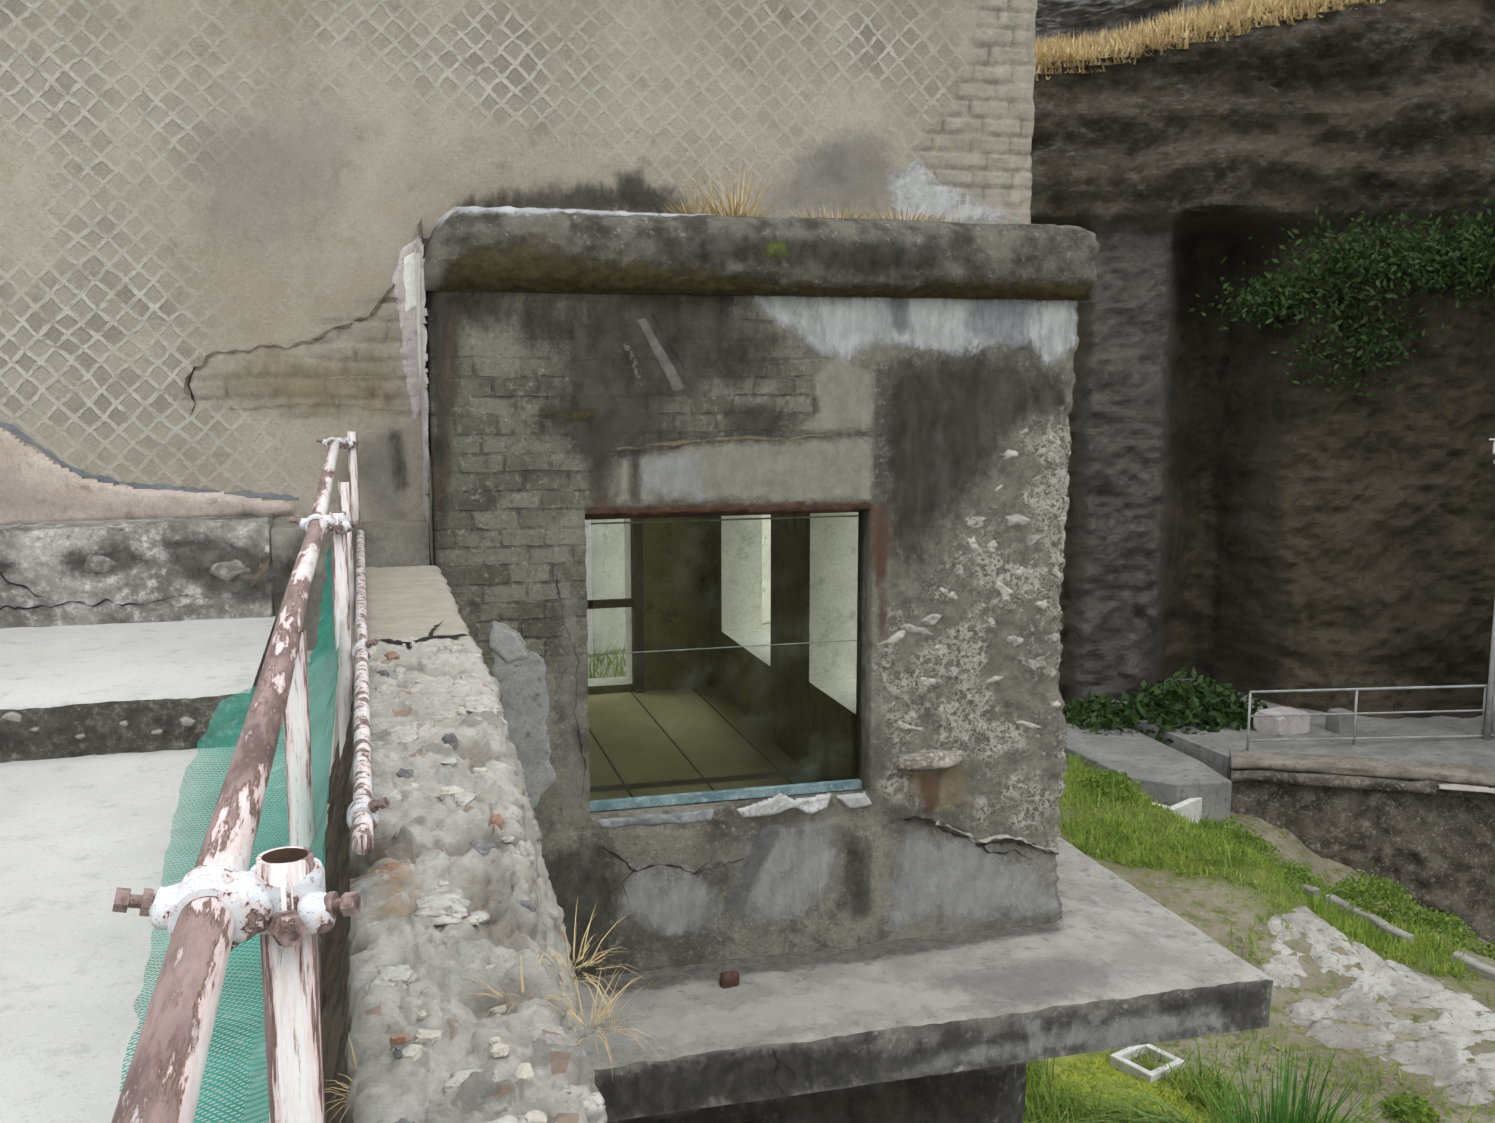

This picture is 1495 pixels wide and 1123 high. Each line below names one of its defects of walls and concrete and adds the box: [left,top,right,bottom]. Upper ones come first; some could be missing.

water stain [436,174,705,224]
crack [184,284,398,416]
flaking render [230,235,431,523]
flaking render [0,428,298,523]
water stain [888,351,1065,559]
crack [378,622,469,649]
spalling [596,809,714,828]
spalling [736,791,872,818]
crack [904,816,1059,860]